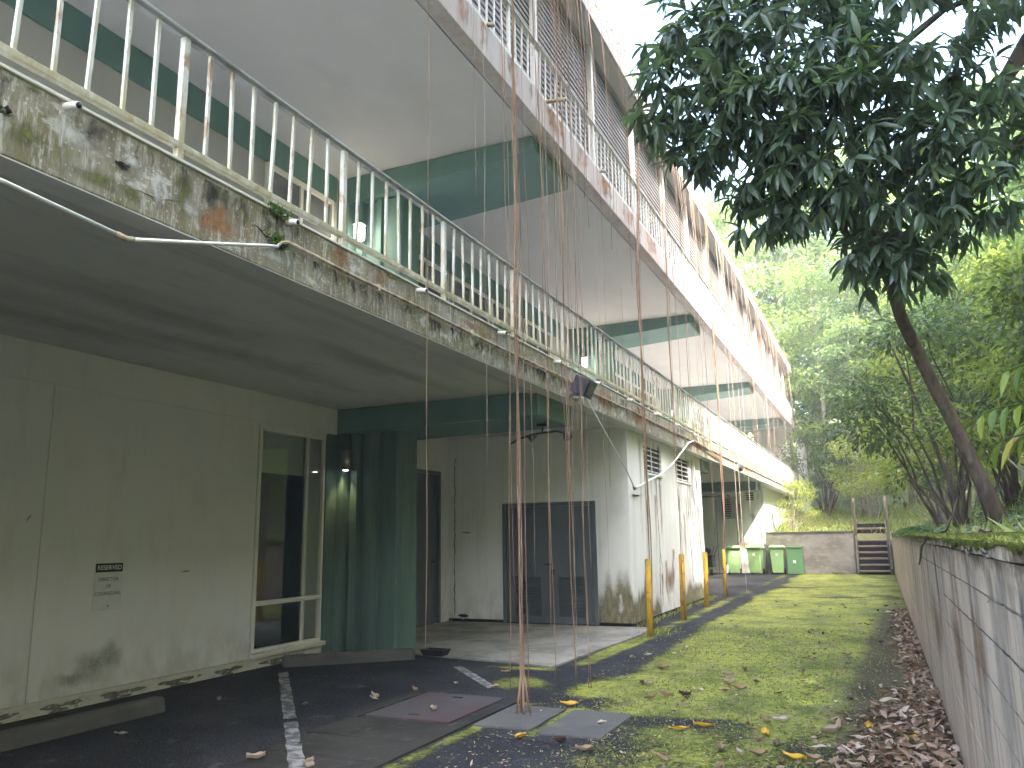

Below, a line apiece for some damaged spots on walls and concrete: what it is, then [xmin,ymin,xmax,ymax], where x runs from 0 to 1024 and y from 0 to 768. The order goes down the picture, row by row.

water stain [59,114,105,155]
water stain [151,167,198,216]
peeling [40,674,202,714]